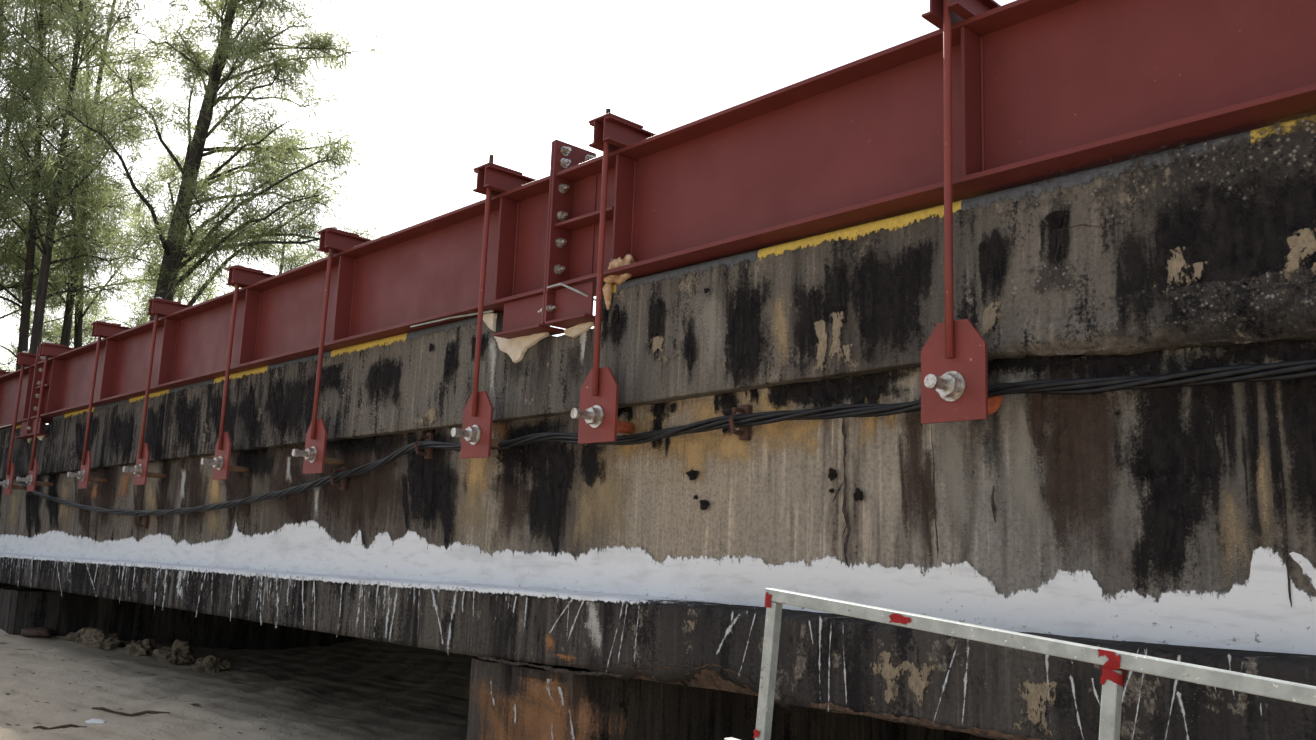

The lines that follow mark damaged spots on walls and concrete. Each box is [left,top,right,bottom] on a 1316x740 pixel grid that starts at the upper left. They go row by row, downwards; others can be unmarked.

spalling [1025,113,1316,228]
spalling [1088,228,1316,345]
damp [443,332,523,397]
peeling [483,313,594,363]
damp [679,239,937,435]
peeling [814,311,853,371]
damp [898,170,1316,598]
damp [0,364,627,556]
rust [545,635,574,661]
damp [585,602,601,646]
rust [478,674,621,740]
peeling [811,650,1068,740]